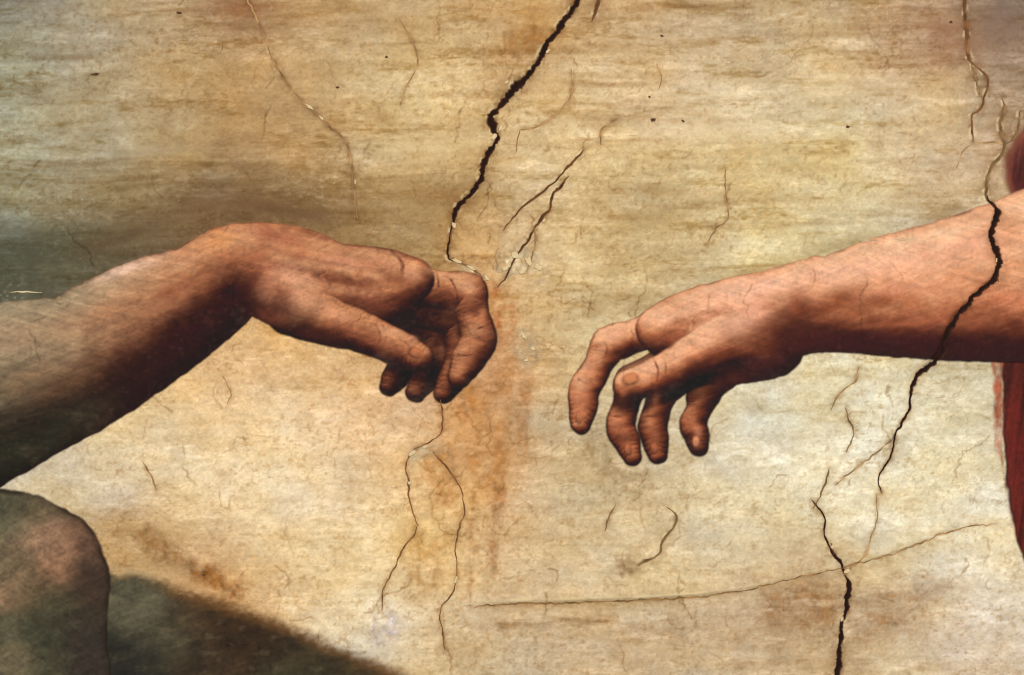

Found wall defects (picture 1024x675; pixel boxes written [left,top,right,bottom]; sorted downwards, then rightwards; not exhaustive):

crack [247,0,358,219]
crack [446,0,619,288]
crack [706,168,729,245]
crack [812,0,1020,675]
crack [382,400,465,649]
crack [638,507,678,566]